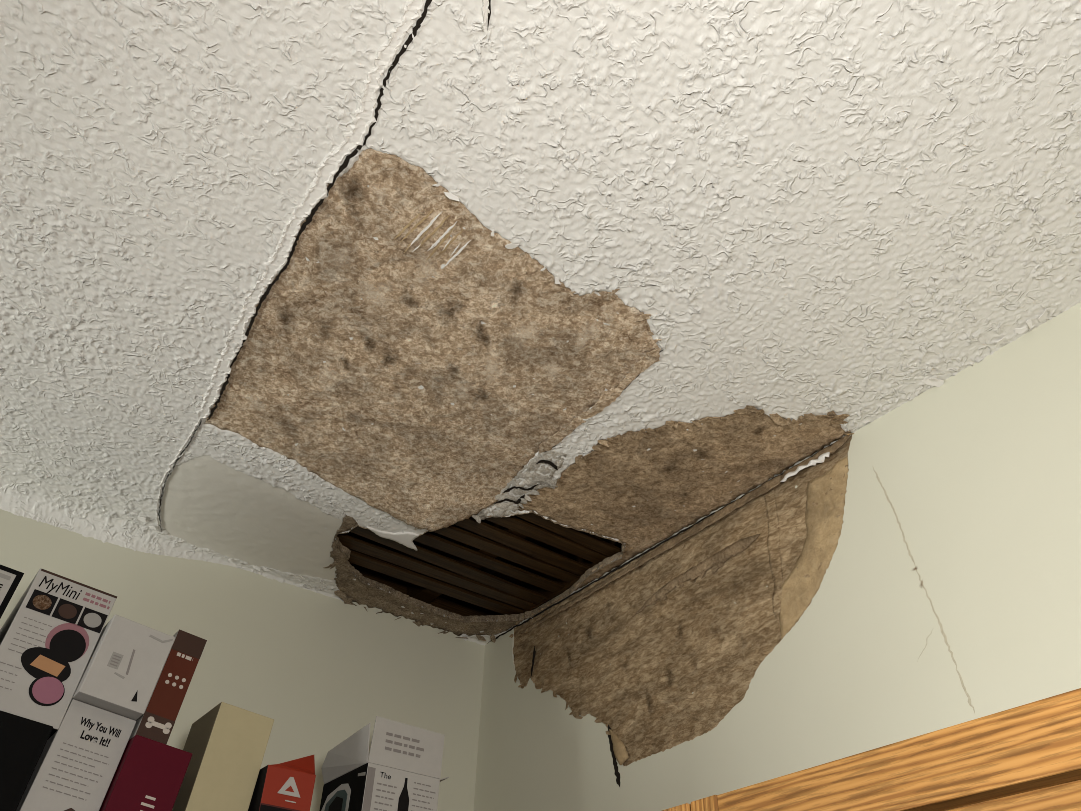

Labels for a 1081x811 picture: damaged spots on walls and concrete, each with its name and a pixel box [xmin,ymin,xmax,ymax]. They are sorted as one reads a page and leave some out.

crack [156,0,432,532]
crack [481,0,491,31]
peeling [134,148,854,766]
crack [873,467,975,713]